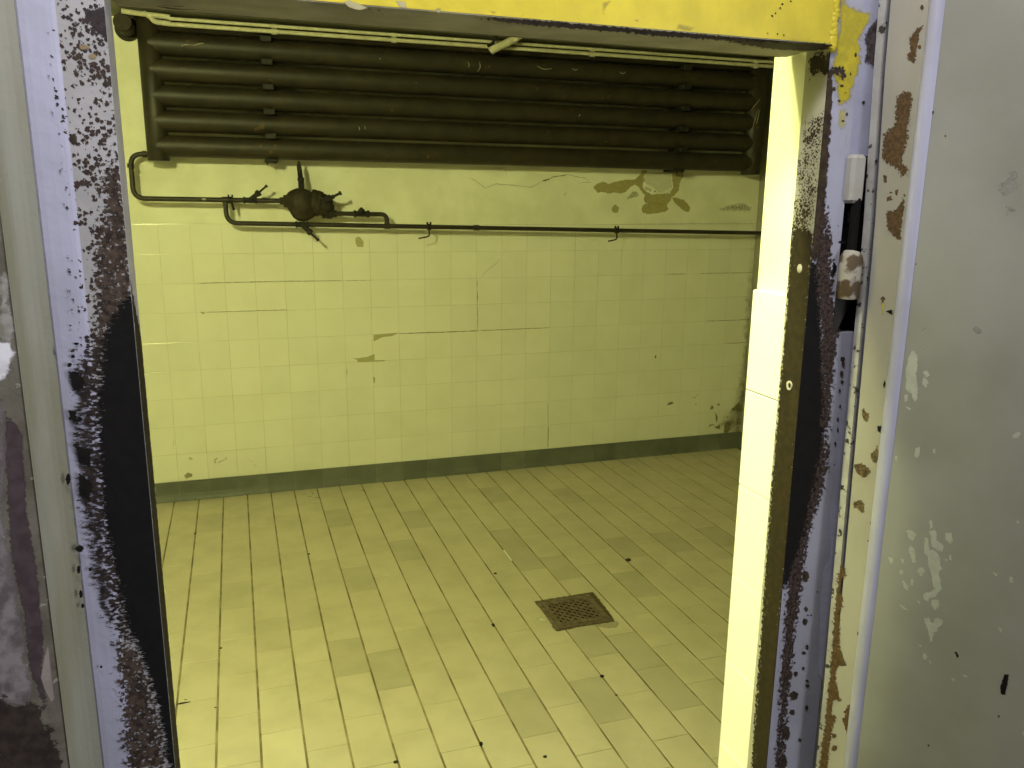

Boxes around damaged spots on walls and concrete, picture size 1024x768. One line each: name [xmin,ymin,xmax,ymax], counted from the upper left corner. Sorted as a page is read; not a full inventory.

crack [471,168,591,196]
flaking render [594,170,690,214]
corrosion [882,91,913,240]
crack [399,265,537,334]
corrosion [49,0,167,768]
peeling [355,354,385,362]
corrosion [481,17,851,768]
peeling [904,350,930,410]
peeling [888,520,953,664]